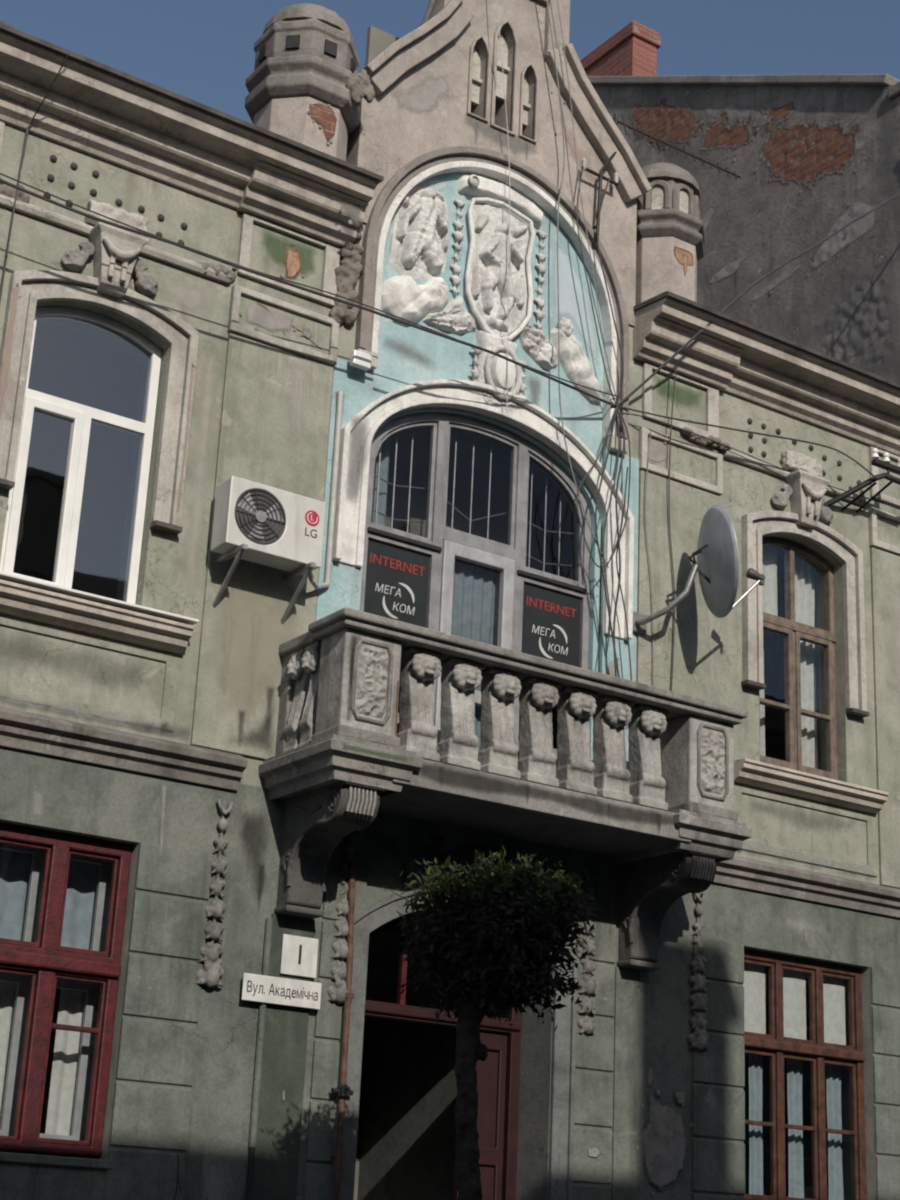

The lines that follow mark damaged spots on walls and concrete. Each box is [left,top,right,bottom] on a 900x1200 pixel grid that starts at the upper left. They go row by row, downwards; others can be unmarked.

flaking render [307,103,337,145]
flaking render [607,91,871,193]
spalling [281,242,305,279]
spalling [635,1068,693,1195]